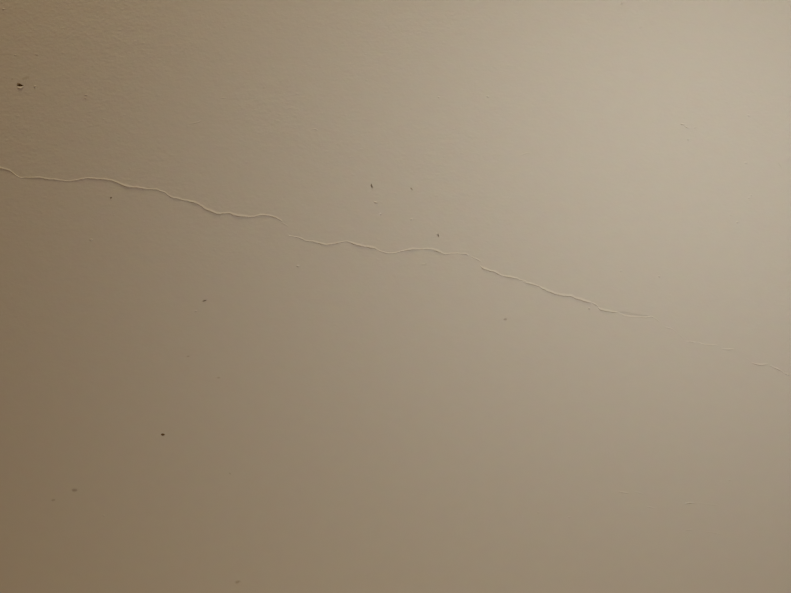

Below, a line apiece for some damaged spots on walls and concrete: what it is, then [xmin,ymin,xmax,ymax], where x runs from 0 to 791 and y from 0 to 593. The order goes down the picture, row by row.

crack [0,166,791,377]